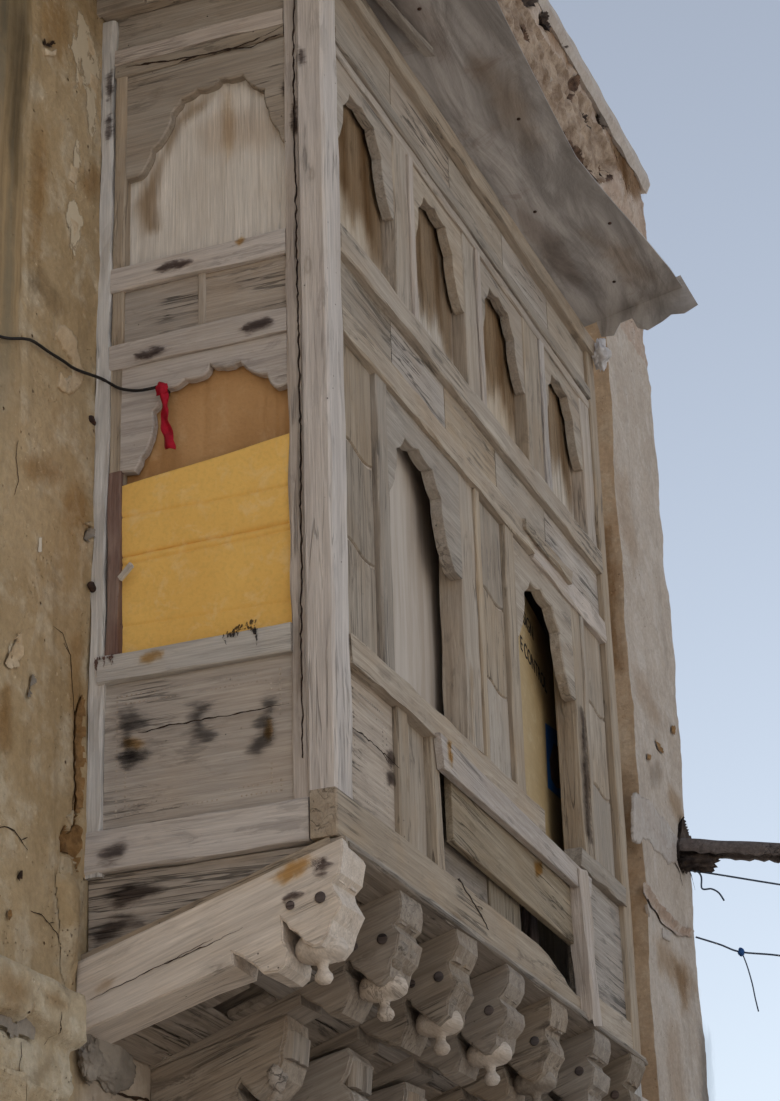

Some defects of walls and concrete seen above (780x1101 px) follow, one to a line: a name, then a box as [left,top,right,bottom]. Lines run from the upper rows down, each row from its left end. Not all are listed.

peeling [43,11,113,256]
crack [53,626,76,828]
spalling [58,695,87,875]
peeling [631,792,691,874]
spalling [642,882,694,942]